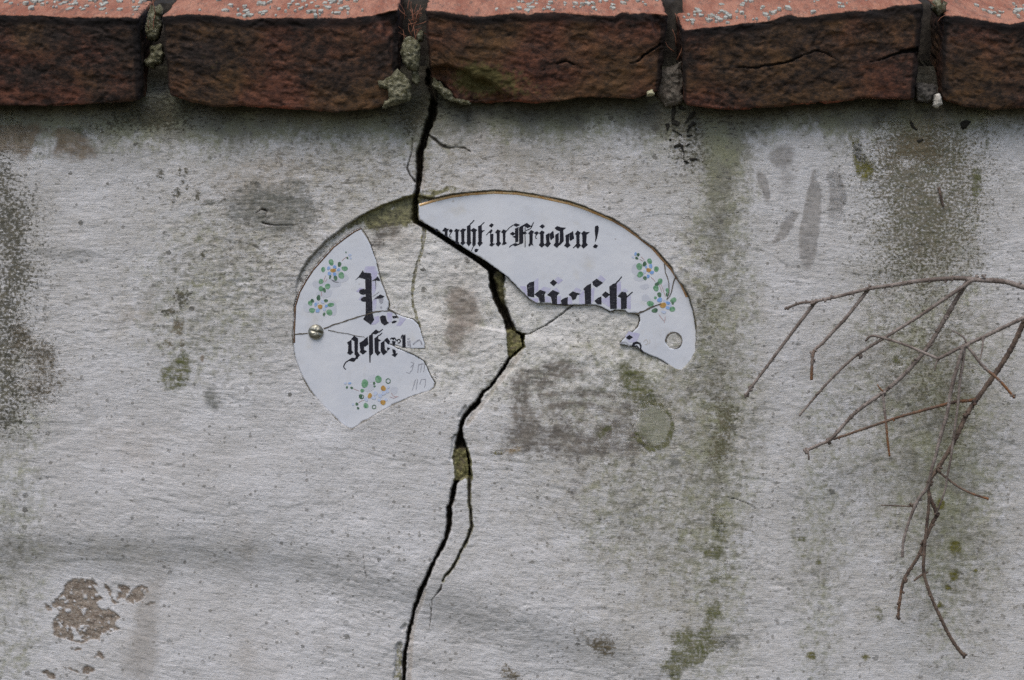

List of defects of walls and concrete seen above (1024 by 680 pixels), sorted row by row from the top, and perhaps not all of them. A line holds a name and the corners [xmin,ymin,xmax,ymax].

crack [734,48,839,71]
crack [869,46,918,64]
damp [0,125,70,443]
crack [400,77,574,680]
peeling [40,580,156,680]